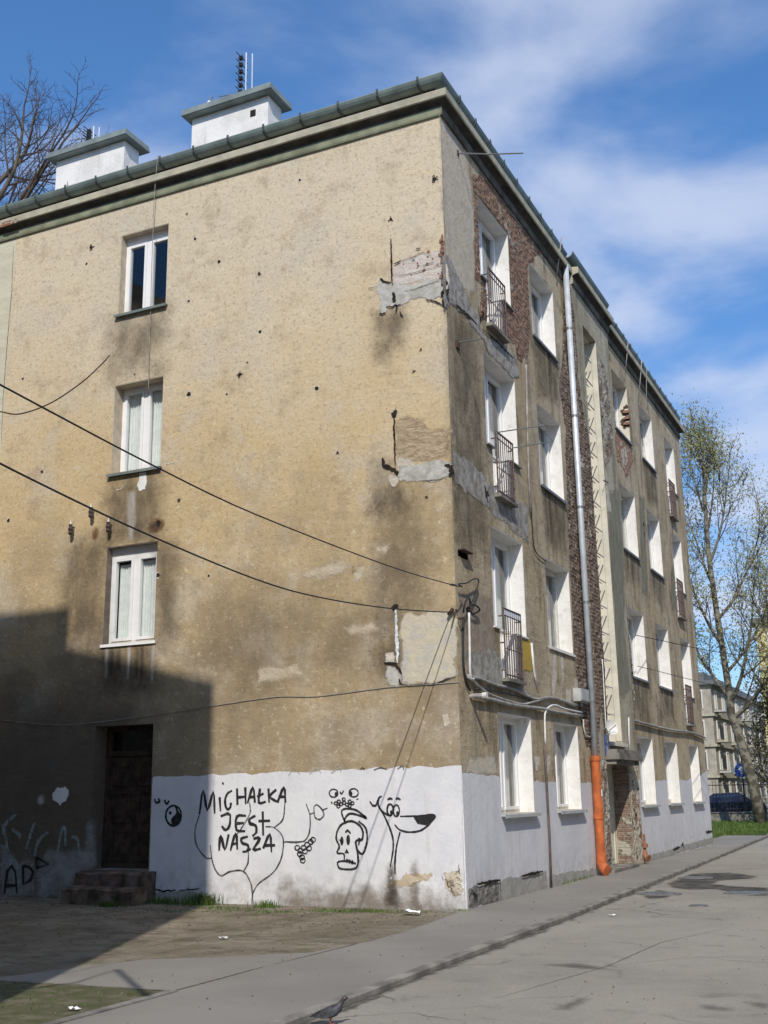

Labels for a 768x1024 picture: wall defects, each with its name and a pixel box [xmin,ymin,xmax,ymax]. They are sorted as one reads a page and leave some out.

flaking render [393,234,449,307]
flaking render [473,172,541,363]
crack [382,409,399,475]
flaking render [388,416,454,487]
flaking render [552,284,644,872]
flaking render [385,610,458,688]
flaking render [385,866,464,897]